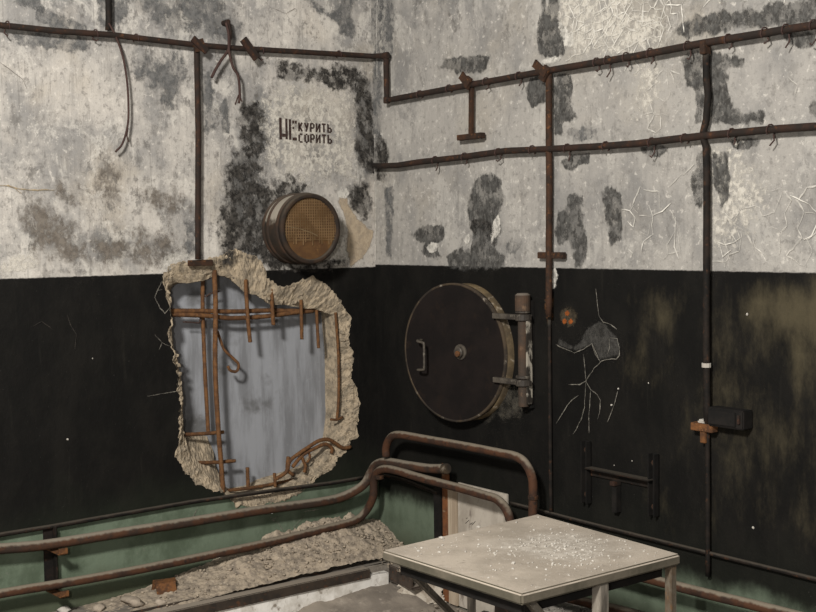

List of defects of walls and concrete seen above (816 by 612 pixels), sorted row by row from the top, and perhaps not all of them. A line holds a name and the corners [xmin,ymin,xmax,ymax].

damp [676,0,816,48]
damp [202,69,264,145]
crack [562,0,684,133]
damp [682,51,765,125]
damp [691,138,756,208]
damp [256,246,345,273]
damp [414,173,516,271]
damp [554,193,587,267]
crack [710,185,816,267]
spalling [162,249,360,509]